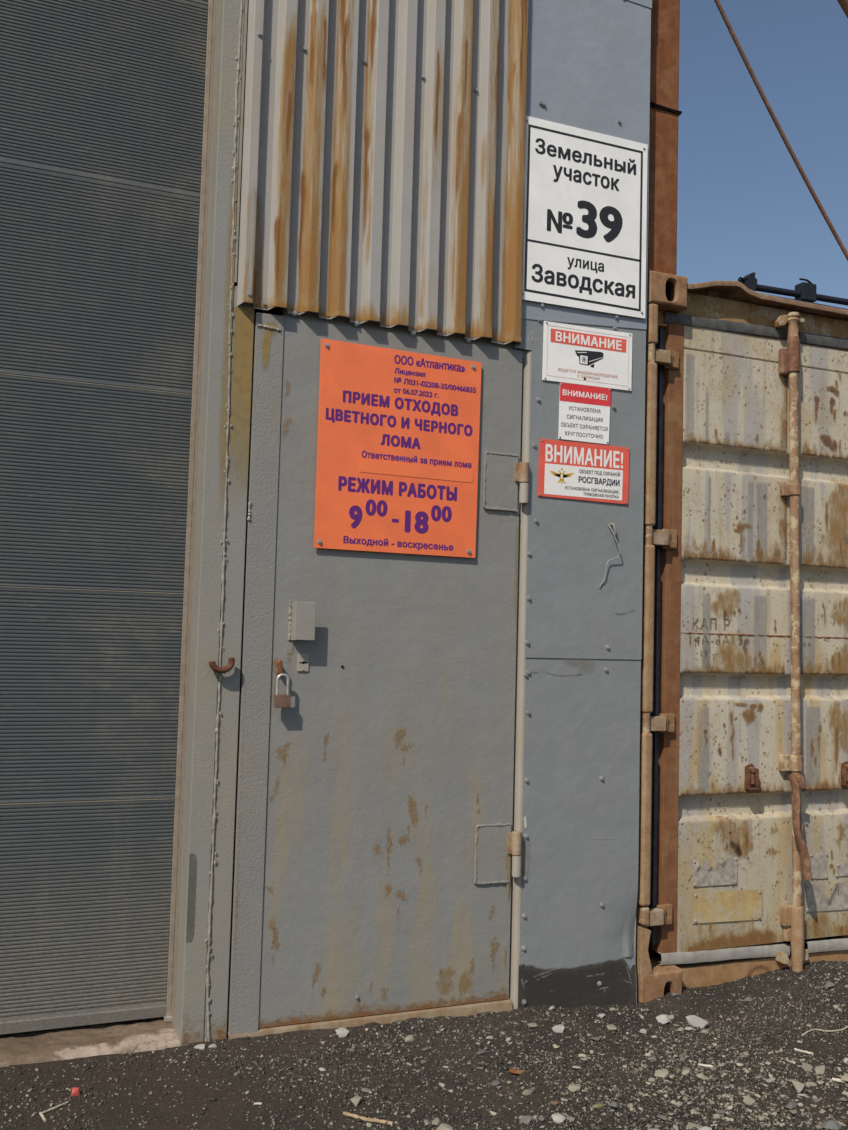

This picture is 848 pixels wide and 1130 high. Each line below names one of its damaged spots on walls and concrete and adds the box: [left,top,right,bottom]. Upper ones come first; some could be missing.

rust [243,0,528,343]
rust [685,375,788,453]
rust [802,434,848,460]
rust [814,370,848,420]
rust [684,482,787,565]
rust [801,482,848,569]
rust [682,636,785,674]
rust [704,702,763,758]
rust [801,703,848,791]
rust [715,816,753,857]
rust [681,919,783,952]
rust [259,958,508,1028]